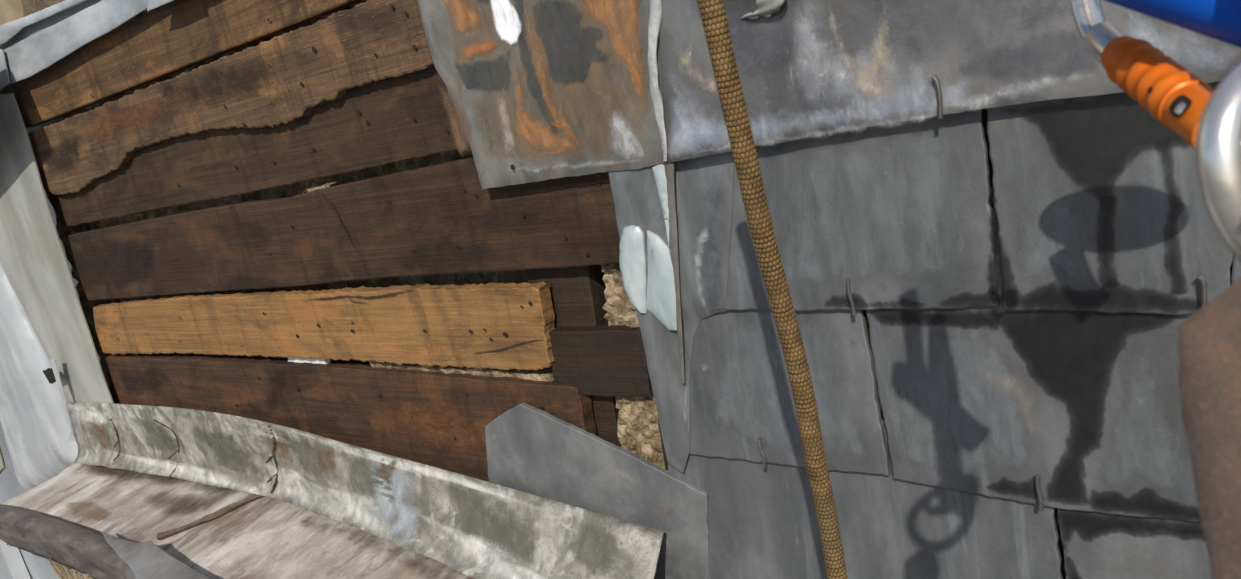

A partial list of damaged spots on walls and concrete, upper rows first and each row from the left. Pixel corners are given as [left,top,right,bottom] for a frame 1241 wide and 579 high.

corrosion [444,0,643,154]
damp [784,135,966,281]
damp [718,328,799,449]
damp [801,326,863,455]
damp [827,95,1209,579]